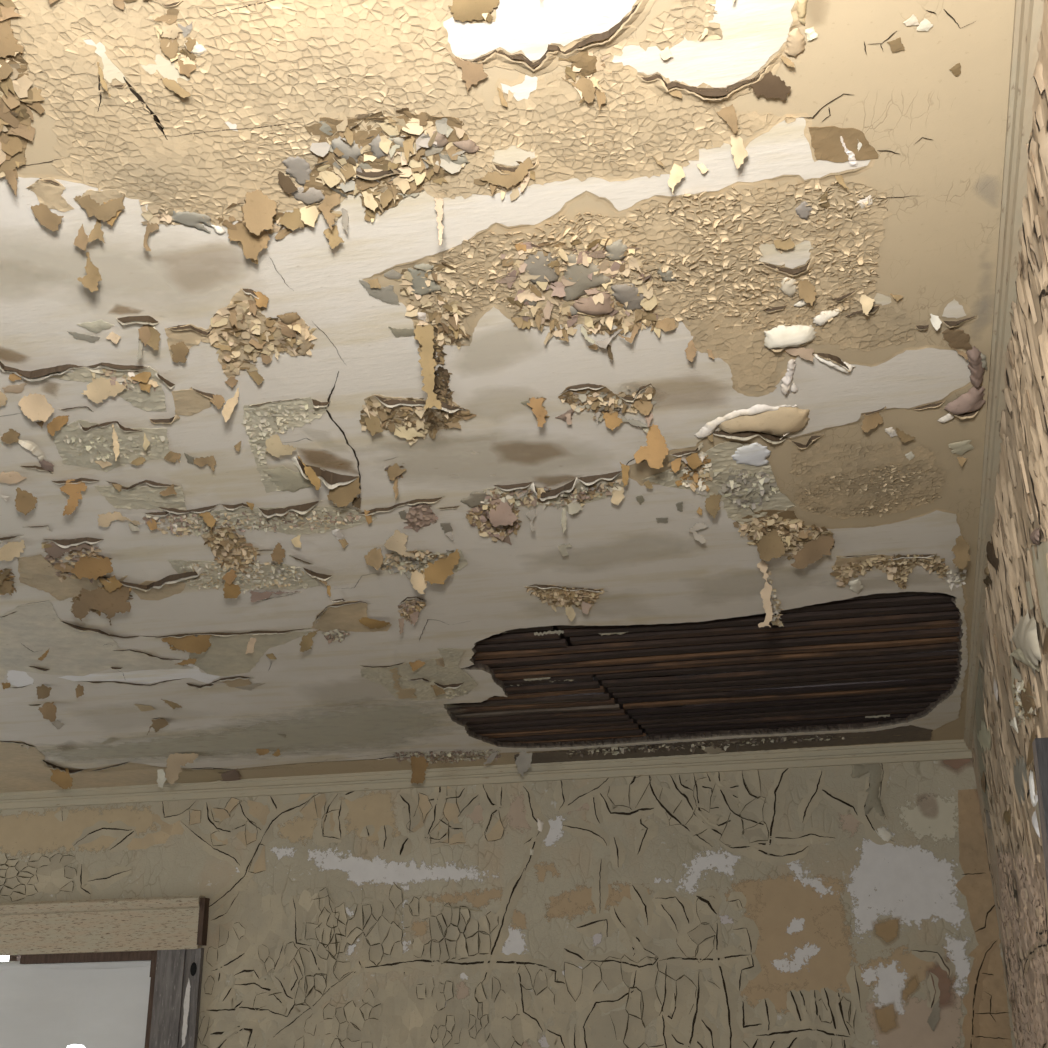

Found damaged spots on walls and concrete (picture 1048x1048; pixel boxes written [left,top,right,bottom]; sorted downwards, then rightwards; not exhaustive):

crack [0,0,926,393]
crack [317,327,361,497]
flaking render [0,0,987,793]
peeling [983,541,999,587]
crack [952,0,1048,1048]
peeling [1003,528,1048,838]
peeling [270,846,503,954]
crack [0,749,869,1048]
peeling [787,763,1013,1048]